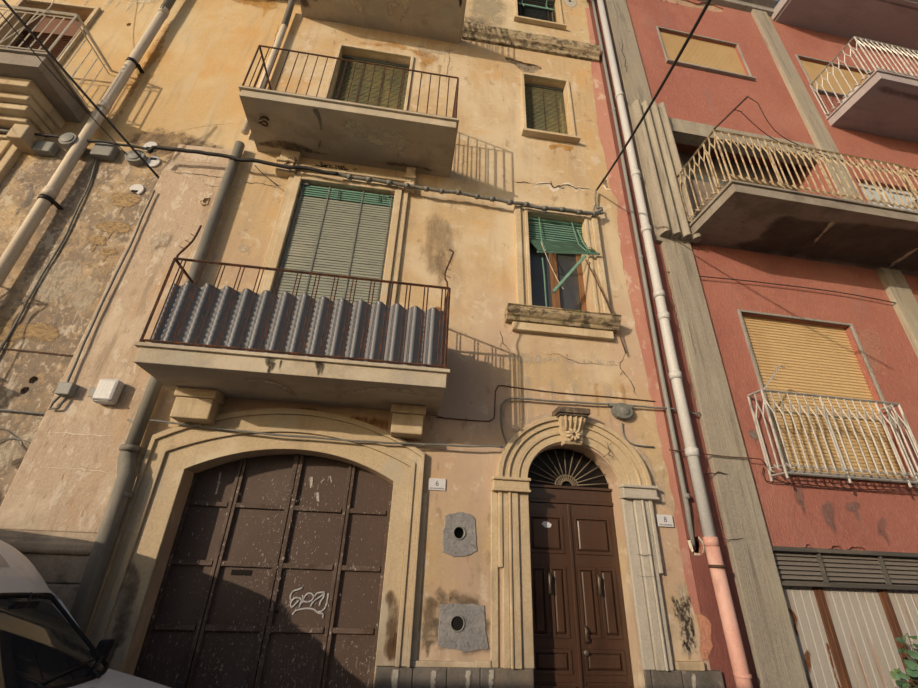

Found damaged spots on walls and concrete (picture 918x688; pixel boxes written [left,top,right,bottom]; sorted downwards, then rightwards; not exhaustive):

spalling [504,57,541,73]
peeling [1,169,34,214]
crack [516,181,592,192]
peeling [88,193,141,262]
peeling [30,261,98,312]
peeling [0,317,59,349]
damp [422,593,478,655]